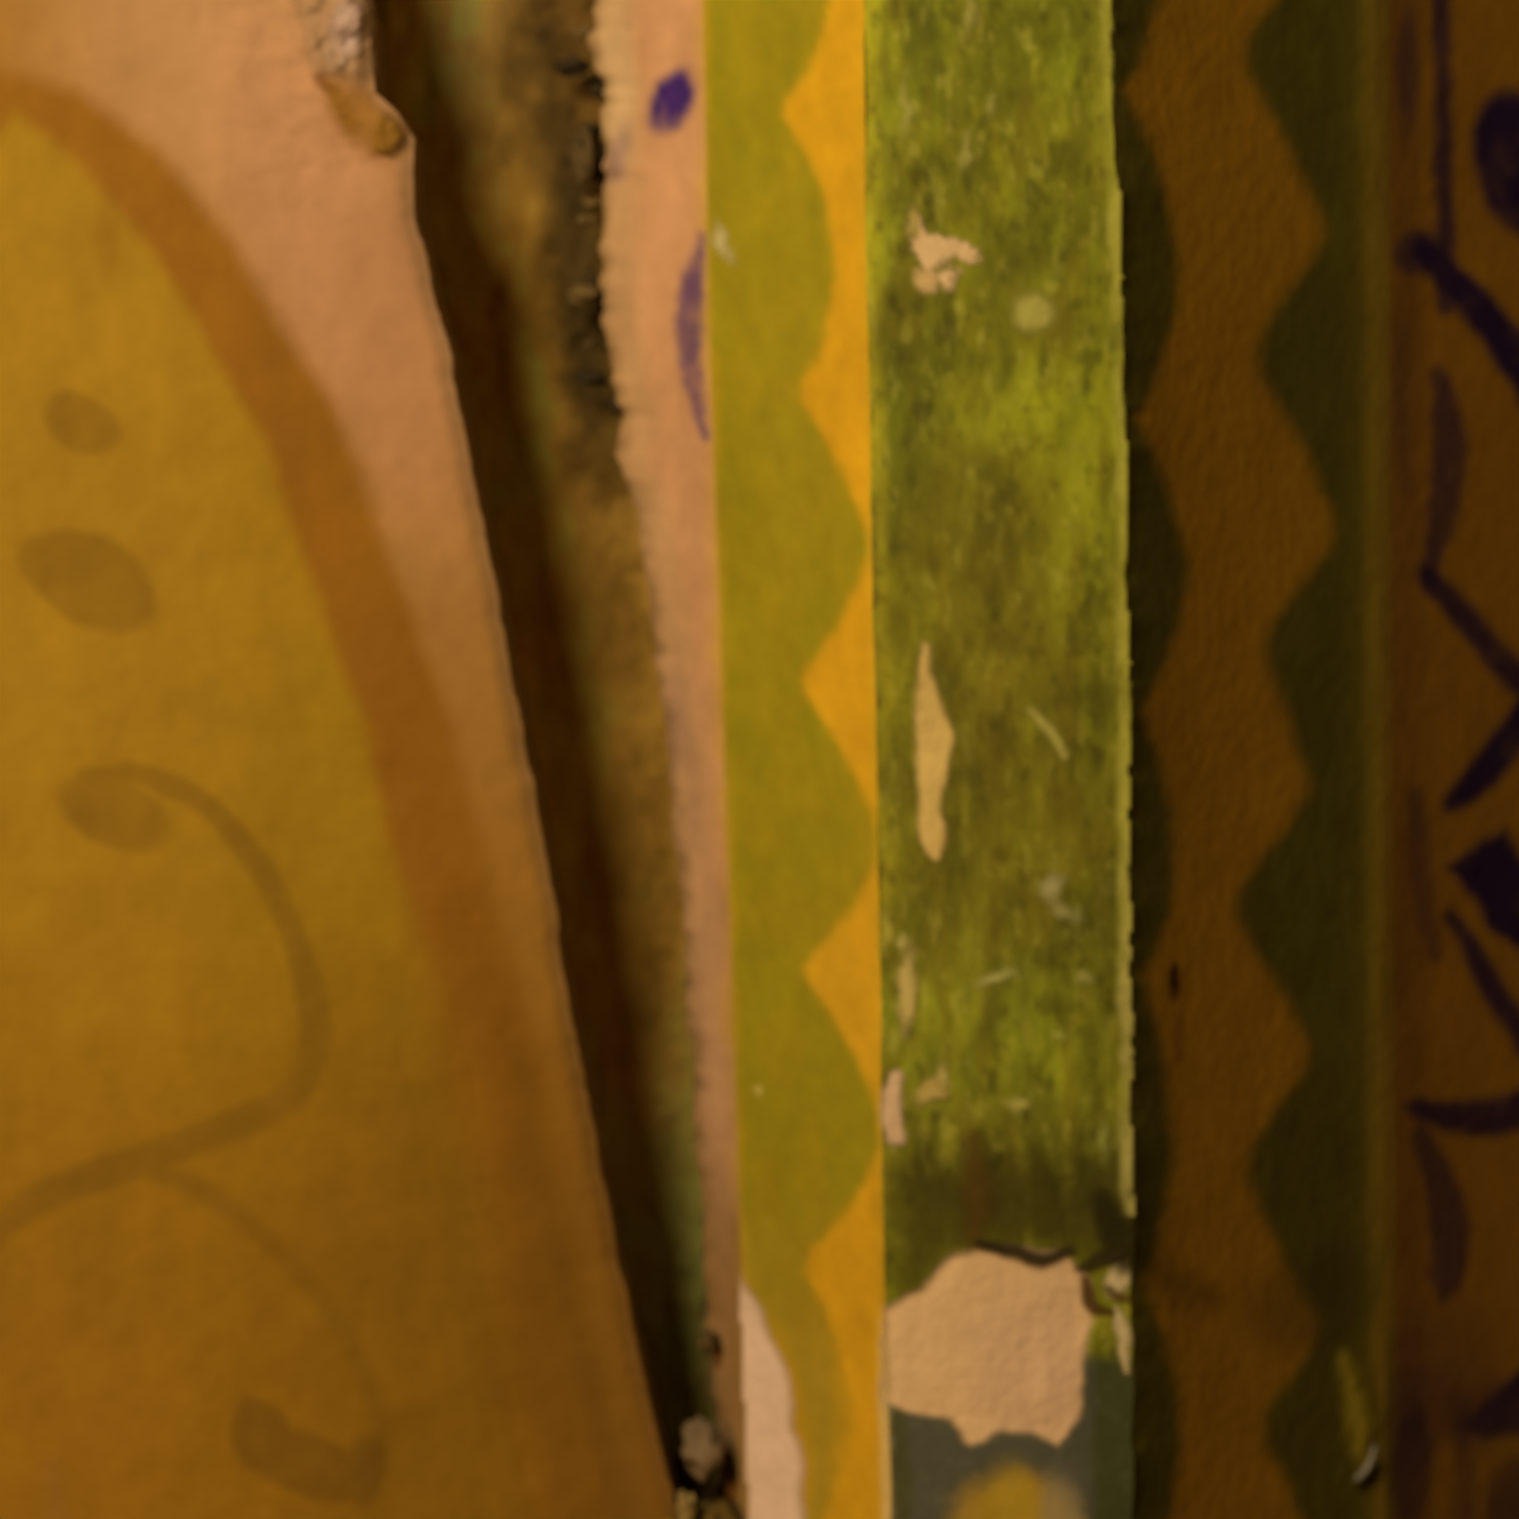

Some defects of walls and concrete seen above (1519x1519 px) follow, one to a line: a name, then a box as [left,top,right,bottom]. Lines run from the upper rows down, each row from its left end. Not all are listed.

spalling [297,0,405,154]
peeling [908,212,980,292]
peeling [915,643,953,860]
peeling [669,1284,803,1519]
peeling [880,1240,1131,1444]